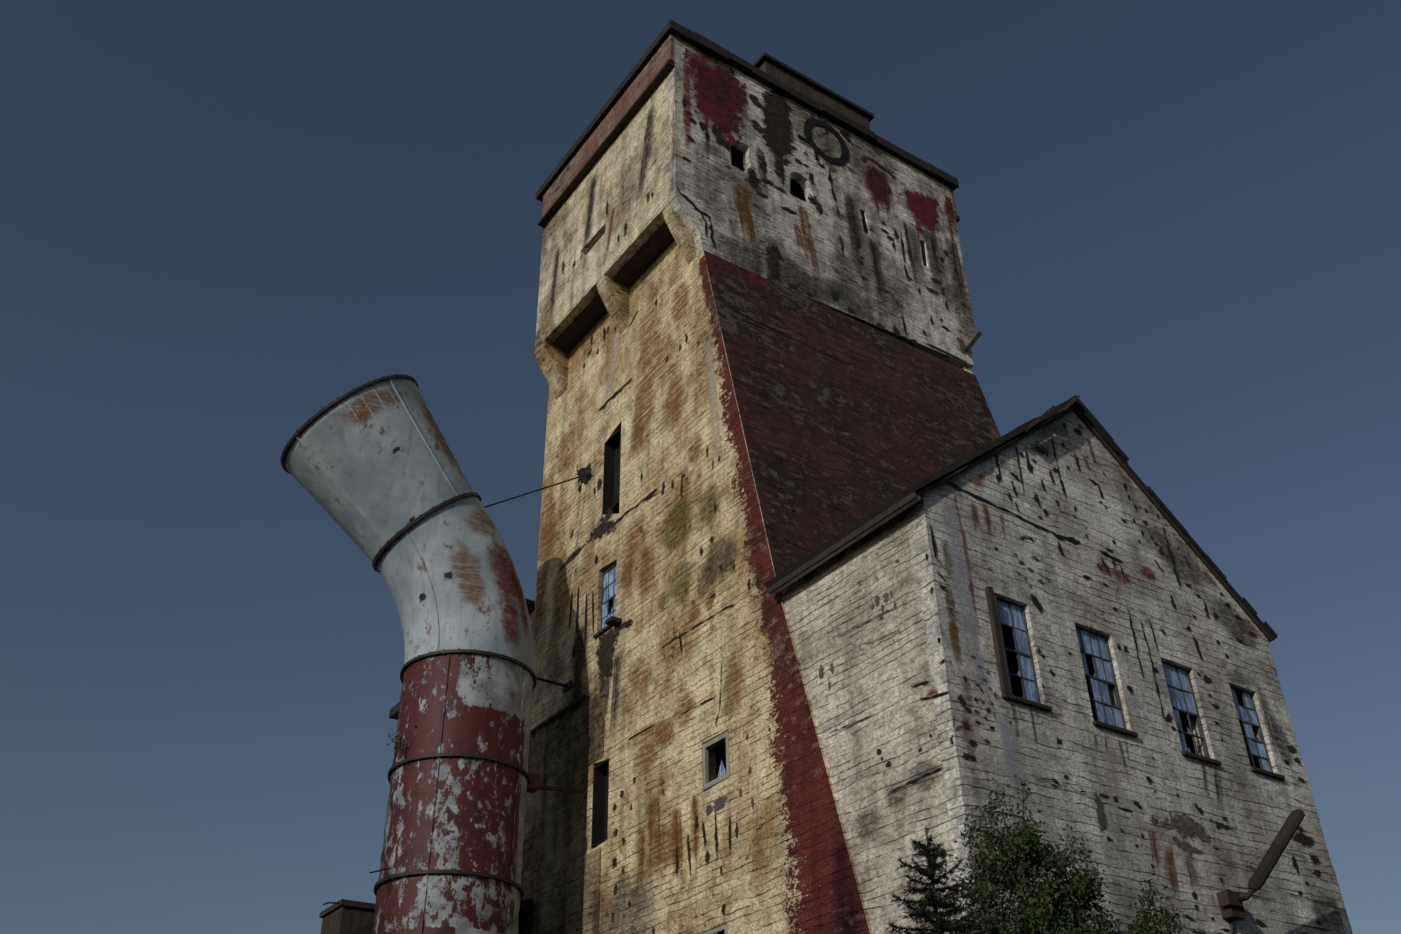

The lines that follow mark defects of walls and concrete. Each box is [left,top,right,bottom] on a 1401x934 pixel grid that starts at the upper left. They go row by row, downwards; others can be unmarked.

flaking render [682,46,973,366]
damp [846,197,880,281]
damp [864,163,964,288]
corrosion [623,520,665,609]
corrosion [690,540,734,622]
peeling [994,422,1257,740]
corrosion [724,657,743,707]
corrosion [638,694,693,770]
corrosion [638,798,698,872]
corrosion [1149,832,1196,886]